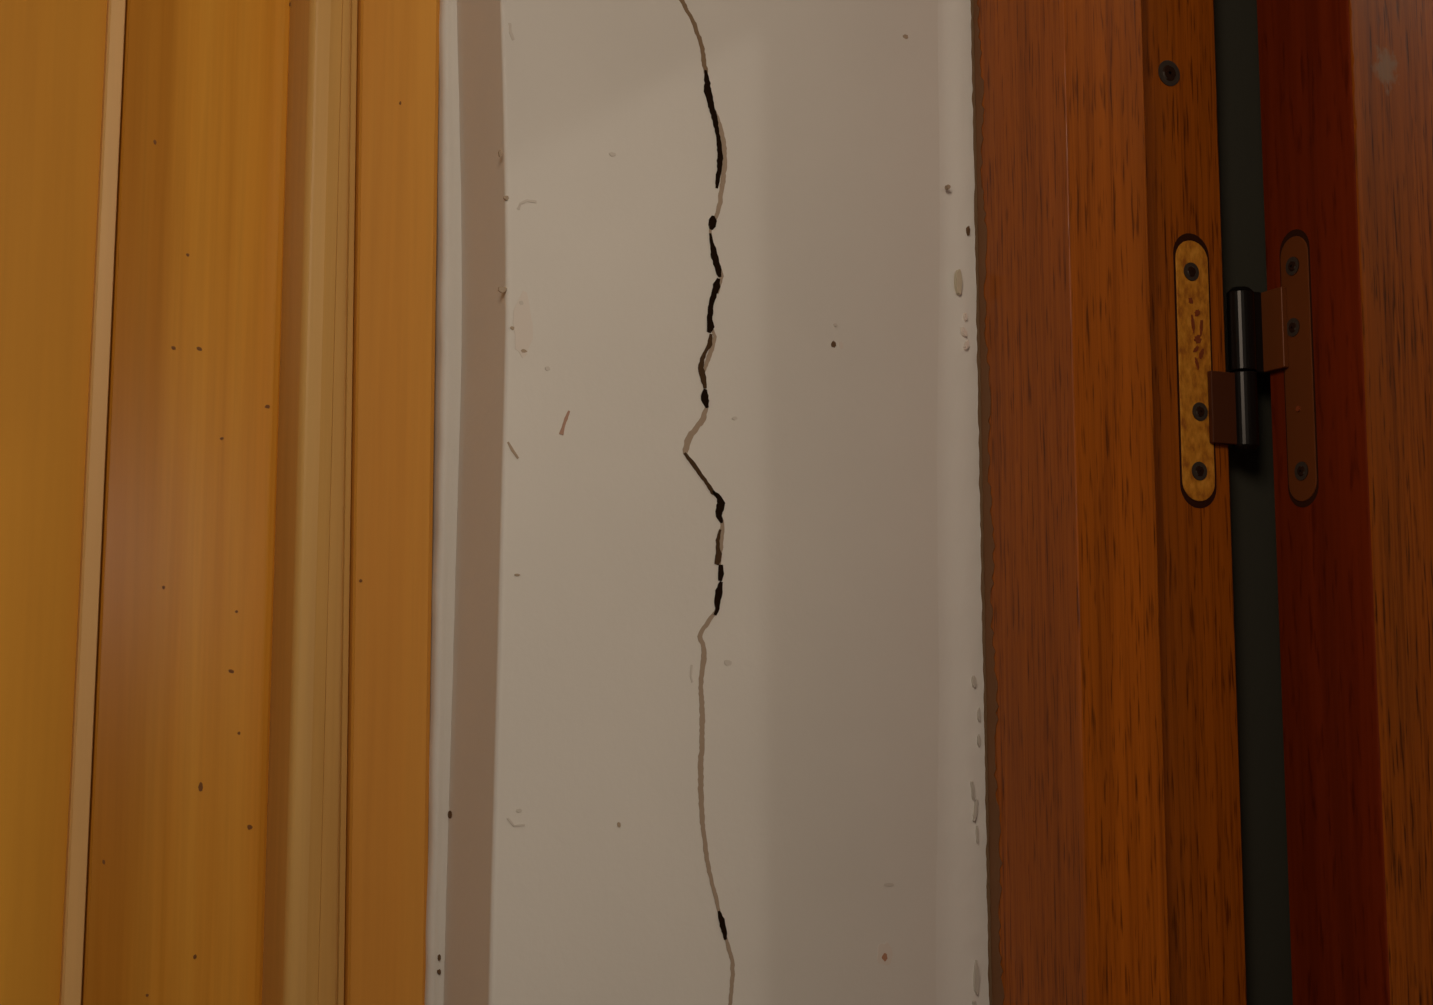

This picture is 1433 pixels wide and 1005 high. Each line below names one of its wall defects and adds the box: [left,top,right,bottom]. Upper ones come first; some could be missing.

crack [679,0,735,1005]